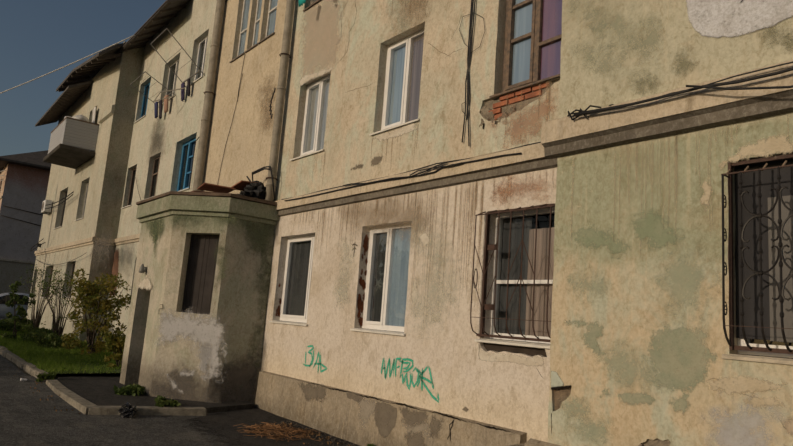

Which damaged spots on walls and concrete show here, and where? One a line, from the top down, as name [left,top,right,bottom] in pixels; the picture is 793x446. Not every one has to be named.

spalling [479,79,560,144]
spalling [478,343,571,433]